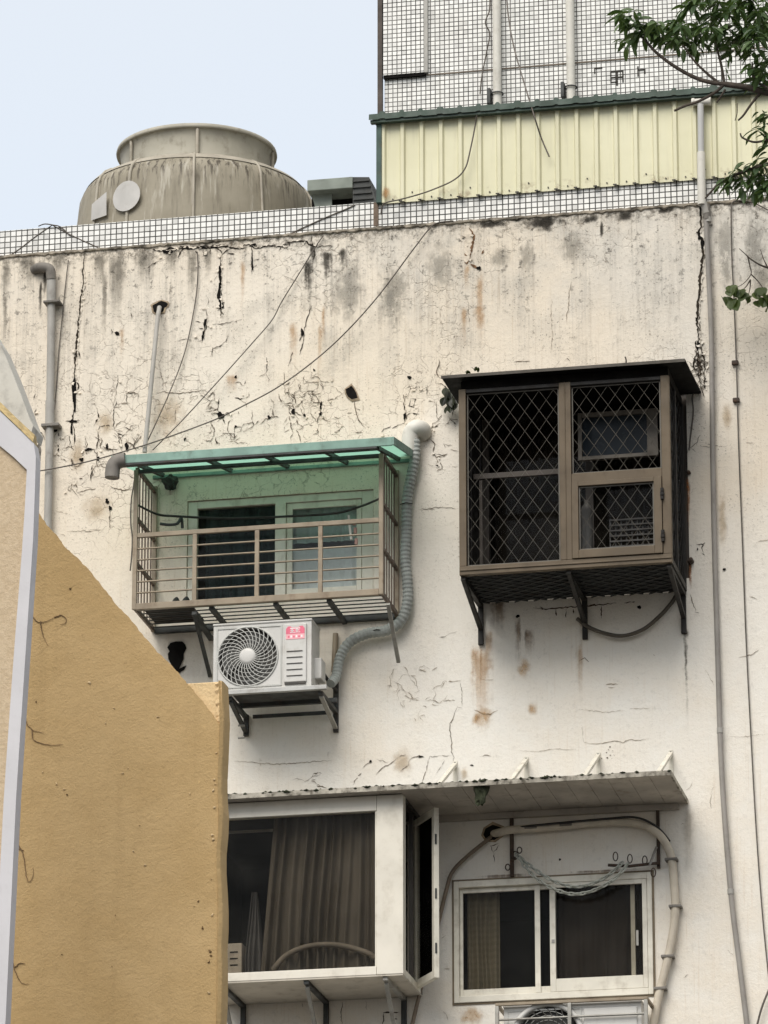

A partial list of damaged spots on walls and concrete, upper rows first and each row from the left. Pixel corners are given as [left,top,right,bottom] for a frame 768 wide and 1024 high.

crack [34,236,458,535]
water stain [531,218,561,230]
crack [682,206,709,397]
crack [354,666,495,782]